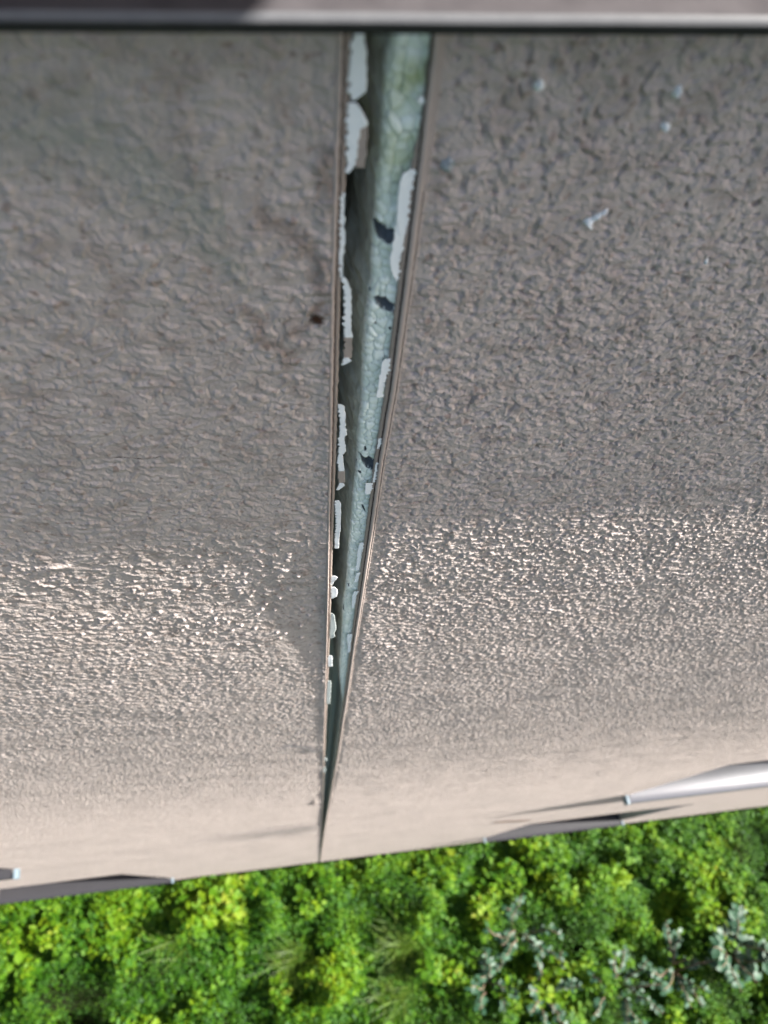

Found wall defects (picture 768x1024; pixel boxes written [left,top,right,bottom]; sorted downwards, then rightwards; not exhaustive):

peeling [344,34,368,173]
peeling [338,193,353,365]
peeling [389,169,417,281]
peeling [376,359,391,398]
peeling [334,404,347,549]
peeling [365,462,379,495]
peeling [352,543,365,608]
peeling [329,613,352,653]